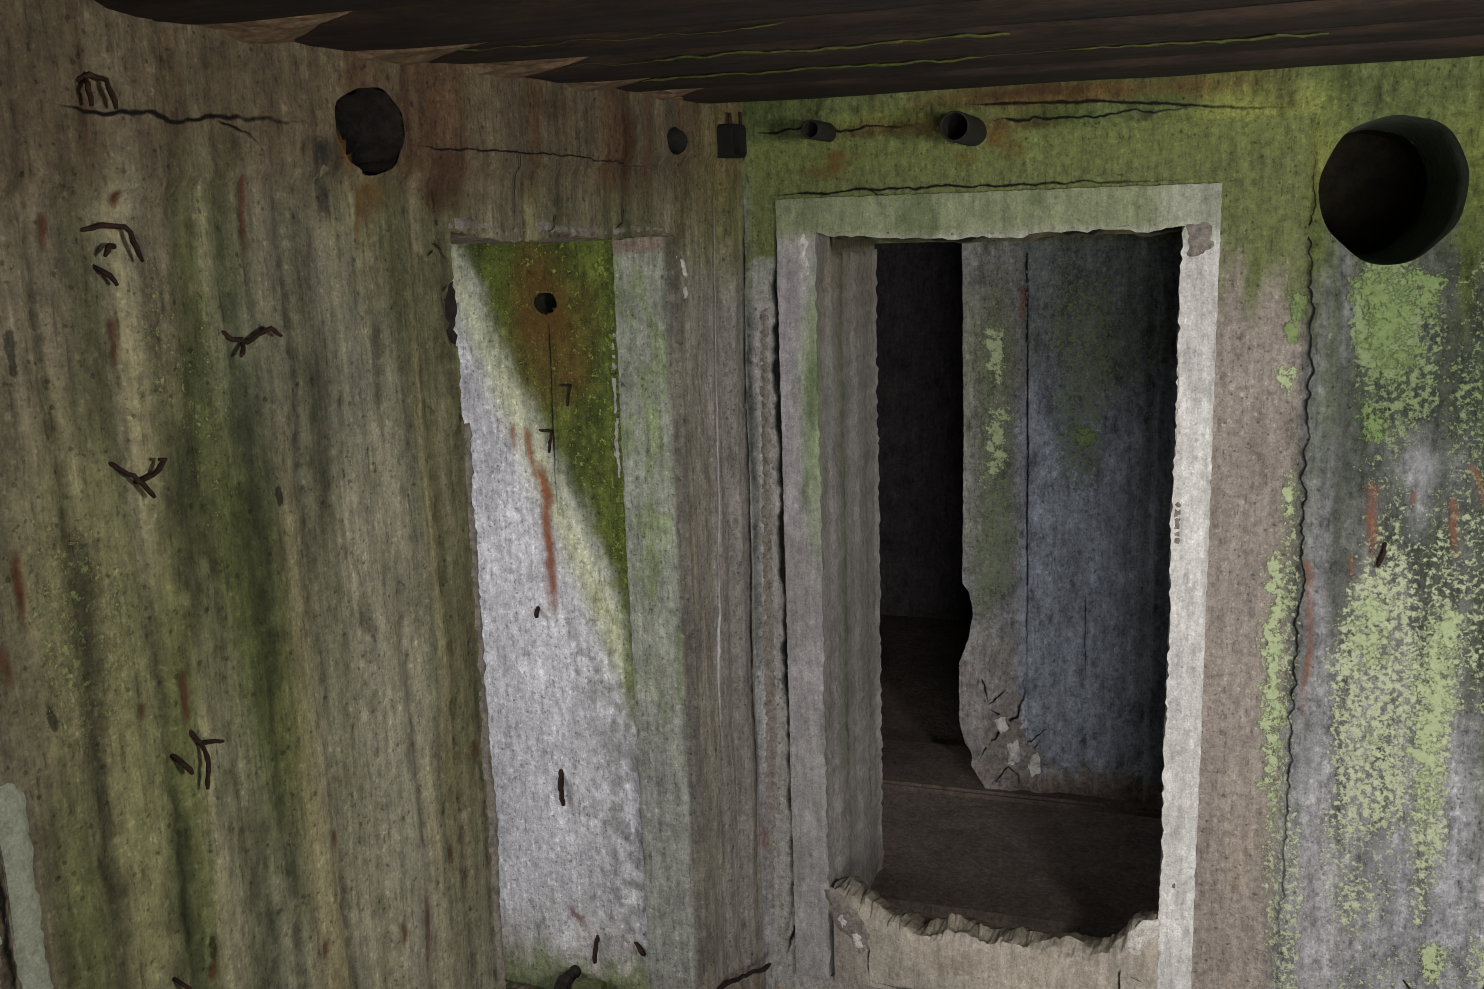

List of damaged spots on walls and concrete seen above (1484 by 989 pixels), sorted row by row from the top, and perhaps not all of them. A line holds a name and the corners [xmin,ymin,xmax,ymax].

crack [67,106,280,143]
crack [760,125,895,135]
crack [981,99,1238,123]
crack [425,146,641,214]
crack [786,180,1125,196]
rust [511,427,555,594]
crack [1277,167,1316,932]
spalling [982,692,1044,787]
crack [0,881,17,989]
spalling [824,887,870,955]
spalling [1125,919,1161,955]